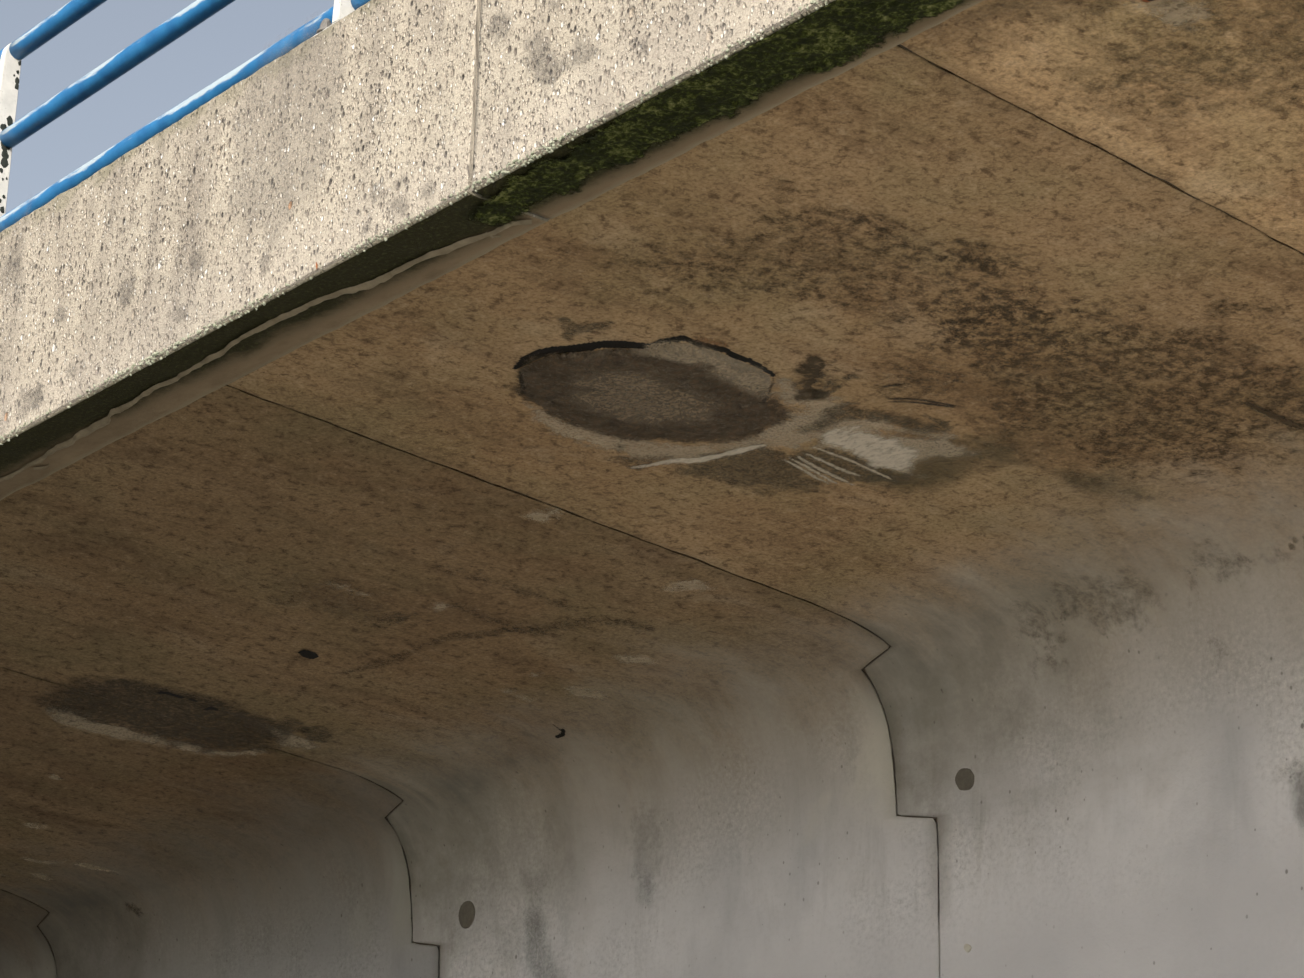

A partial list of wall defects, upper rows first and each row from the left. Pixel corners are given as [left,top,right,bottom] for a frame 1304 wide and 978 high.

peeling [512,335,845,494]
leakage [638,207,1304,487]
leakage [39,676,331,755]